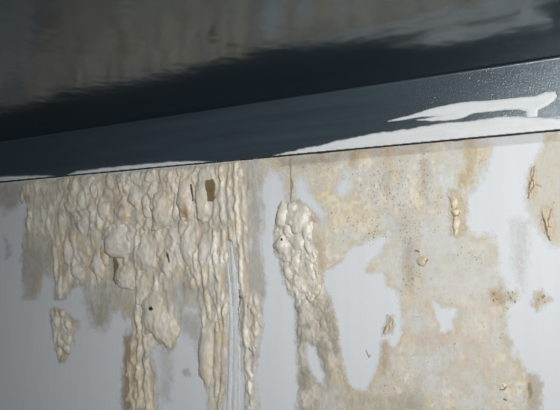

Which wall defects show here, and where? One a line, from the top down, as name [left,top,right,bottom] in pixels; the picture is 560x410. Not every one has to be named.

peeling [527,167,540,199]
leakage [529,134,560,243]
peeling [449,190,466,238]
peeling [541,207,554,241]
leakage [262,139,542,410]